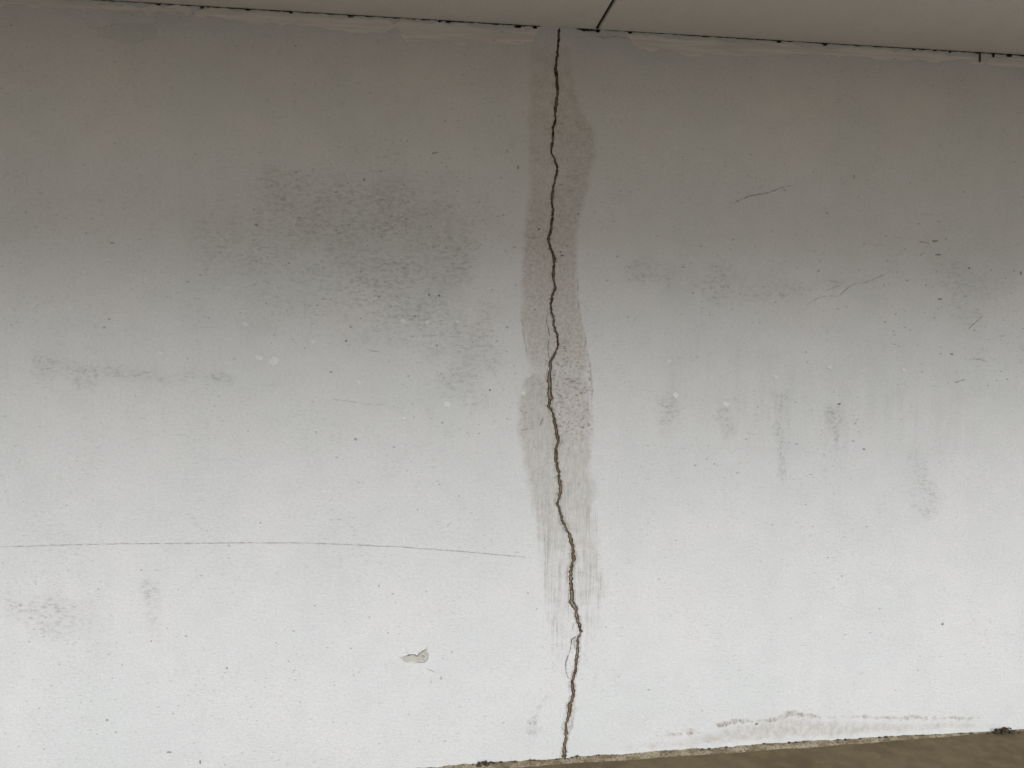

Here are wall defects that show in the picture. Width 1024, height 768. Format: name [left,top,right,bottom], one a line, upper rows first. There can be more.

crack [101,0,540,29]
crack [546,28,1024,758]
peeling [401,647,429,663]